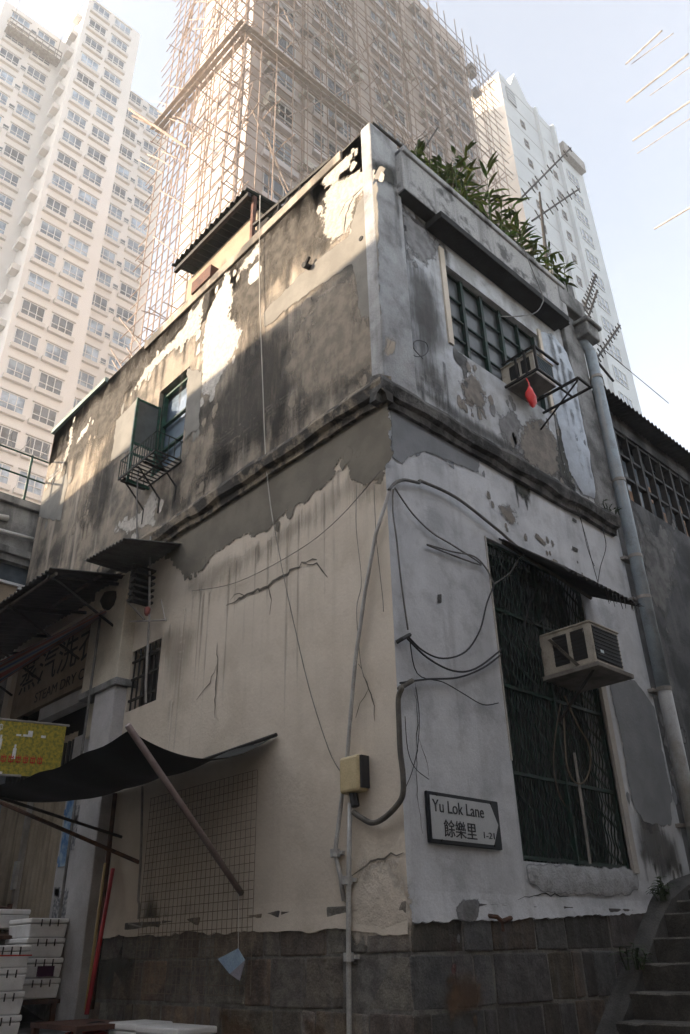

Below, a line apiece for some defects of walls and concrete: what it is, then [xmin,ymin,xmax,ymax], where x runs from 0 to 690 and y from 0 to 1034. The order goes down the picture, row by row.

peeling [316,148,384,244]
damp [57,199,330,530]
peeling [131,243,262,504]
peeling [453,348,564,484]
crack [226,558,327,615]